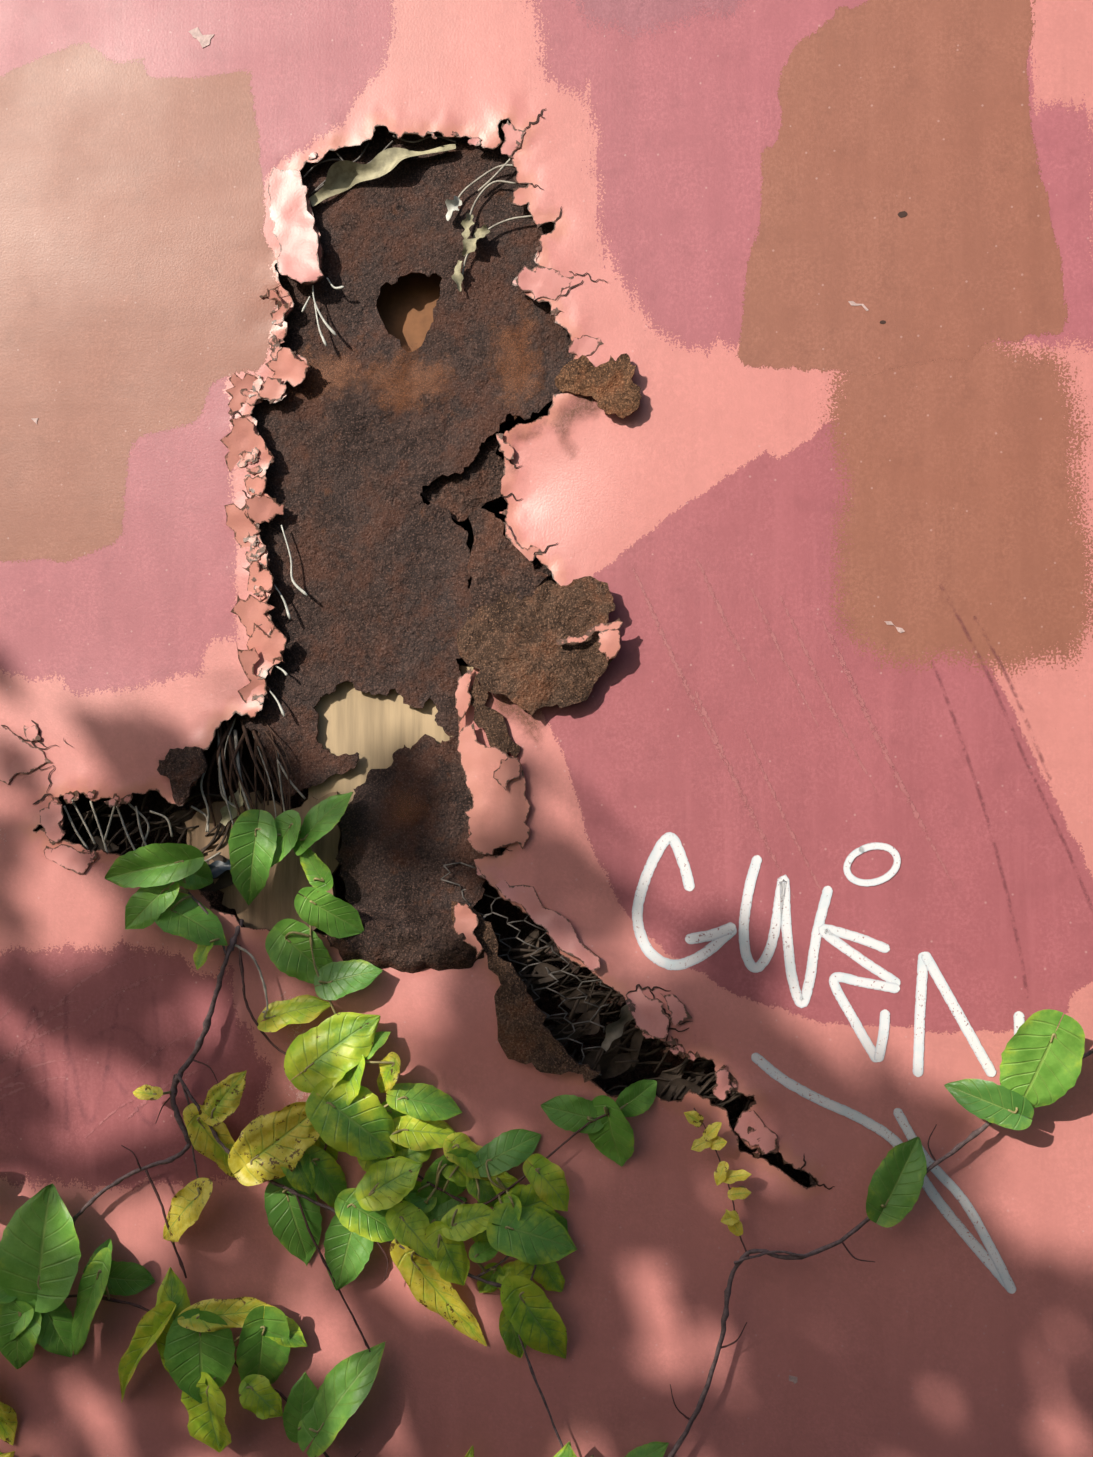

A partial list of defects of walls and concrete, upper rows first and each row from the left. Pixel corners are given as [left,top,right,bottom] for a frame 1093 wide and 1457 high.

peeling [500,121,526,158]
peeling [512,246,574,316]
peeling [220,152,324,704]
peeling [496,433,514,460]
corrosion [236,120,642,1083]
crack [1,720,72,805]
peeling [39,790,133,874]
peeling [455,668,600,972]
crack [628,984,691,1045]
peeling [626,988,700,1061]
peeling [712,1065,738,1101]
peeling [734,1110,779,1158]